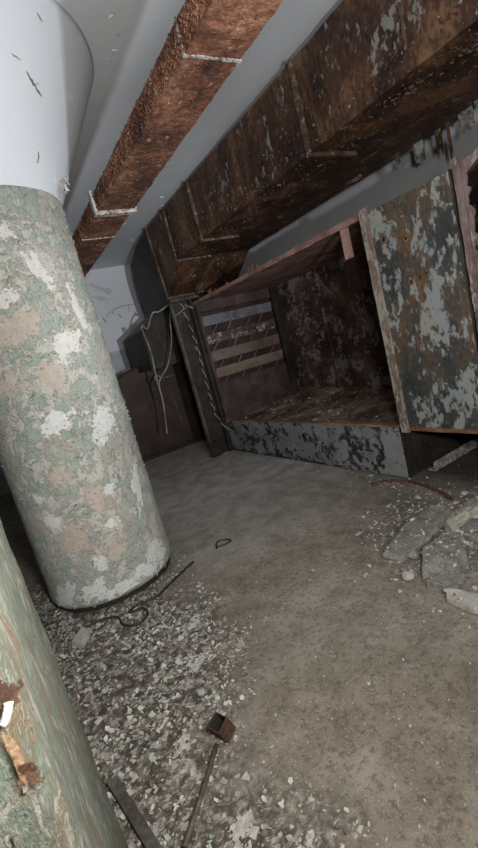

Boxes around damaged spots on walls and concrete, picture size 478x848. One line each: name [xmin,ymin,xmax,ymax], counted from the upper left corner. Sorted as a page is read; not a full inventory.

peeling [38,400,118,446]
peeling [102,481,117,495]
peeling [130,459,143,520]
peeling [32,493,66,535]
peeling [103,515,122,532]
corrosion [0,678,46,788]